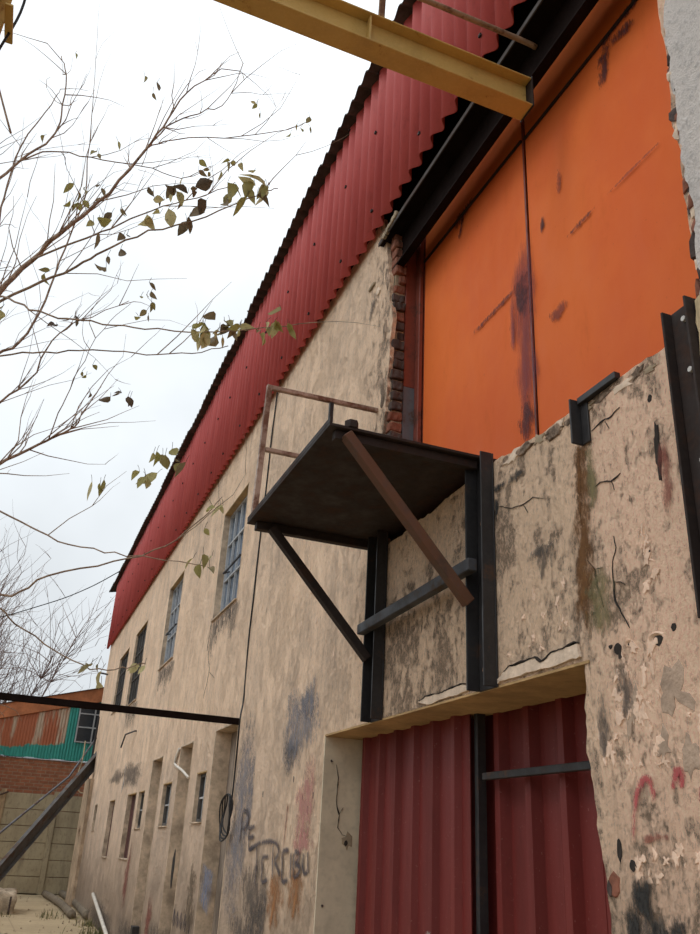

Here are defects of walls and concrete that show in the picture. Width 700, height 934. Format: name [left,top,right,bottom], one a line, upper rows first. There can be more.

spalling [368,234,407,438]
leakage [530,542,552,579]
crack [587,536,630,628]
spalling [497,633,582,684]
spalling [419,683,467,705]
peeling [598,623,700,779]
peeling [607,839,700,898]